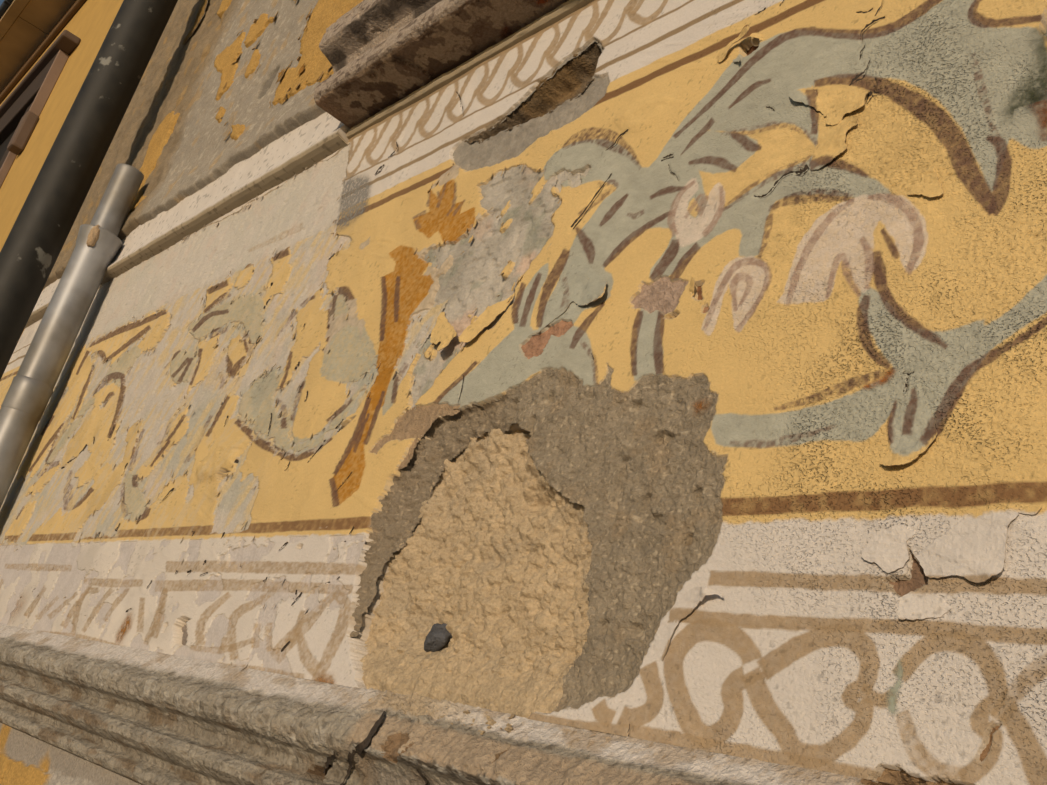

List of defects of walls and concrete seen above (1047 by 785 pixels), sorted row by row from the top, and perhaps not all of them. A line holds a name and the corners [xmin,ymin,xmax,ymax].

crack [849,1,885,104]
flaking render [42,0,334,291]
peeling [0,144,381,642]
flaking render [130,39,727,735]
peeling [861,506,1042,620]
crack [323,711,385,785]
flaking render [861,768,963,785]